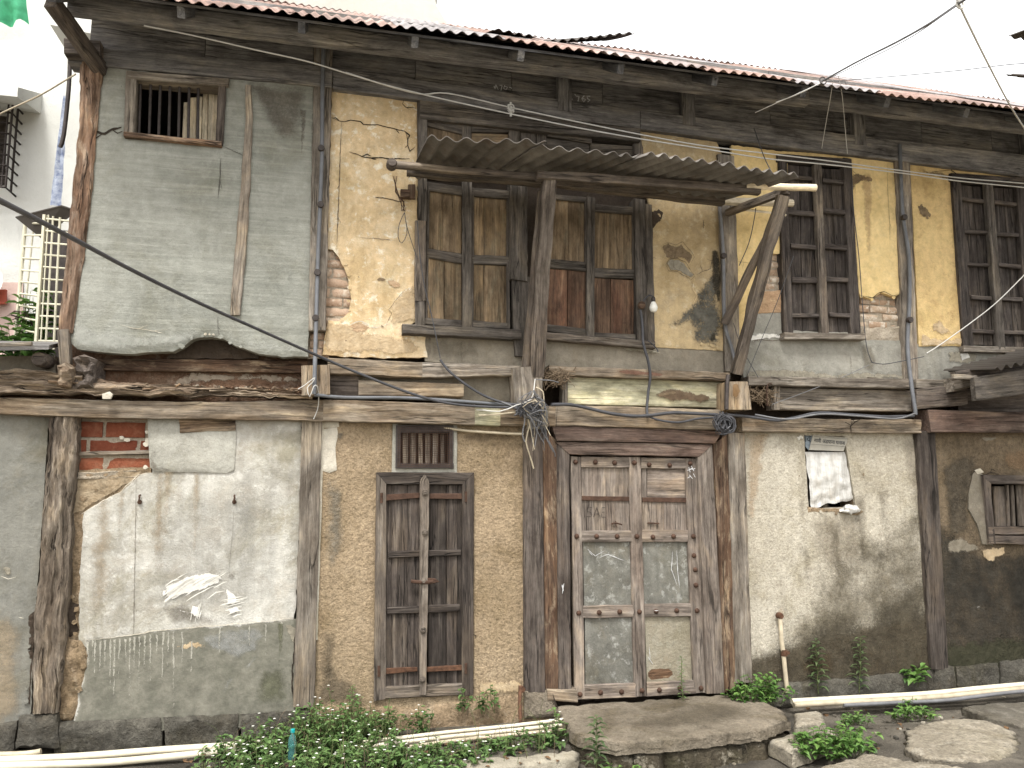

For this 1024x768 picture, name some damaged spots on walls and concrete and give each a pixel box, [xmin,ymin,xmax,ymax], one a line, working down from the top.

crack [96,127,122,138]
crack [334,100,414,251]
peeling [663,242,695,280]
peeling [308,250,418,359]
spalling [751,255,781,342]
flaking render [859,291,900,341]
spalling [167,333,259,360]
peeling [983,547,1005,561]
spalling [67,595,80,643]
peeling [226,589,239,614]
water stain [748,515,933,695]
water stain [75,609,298,731]